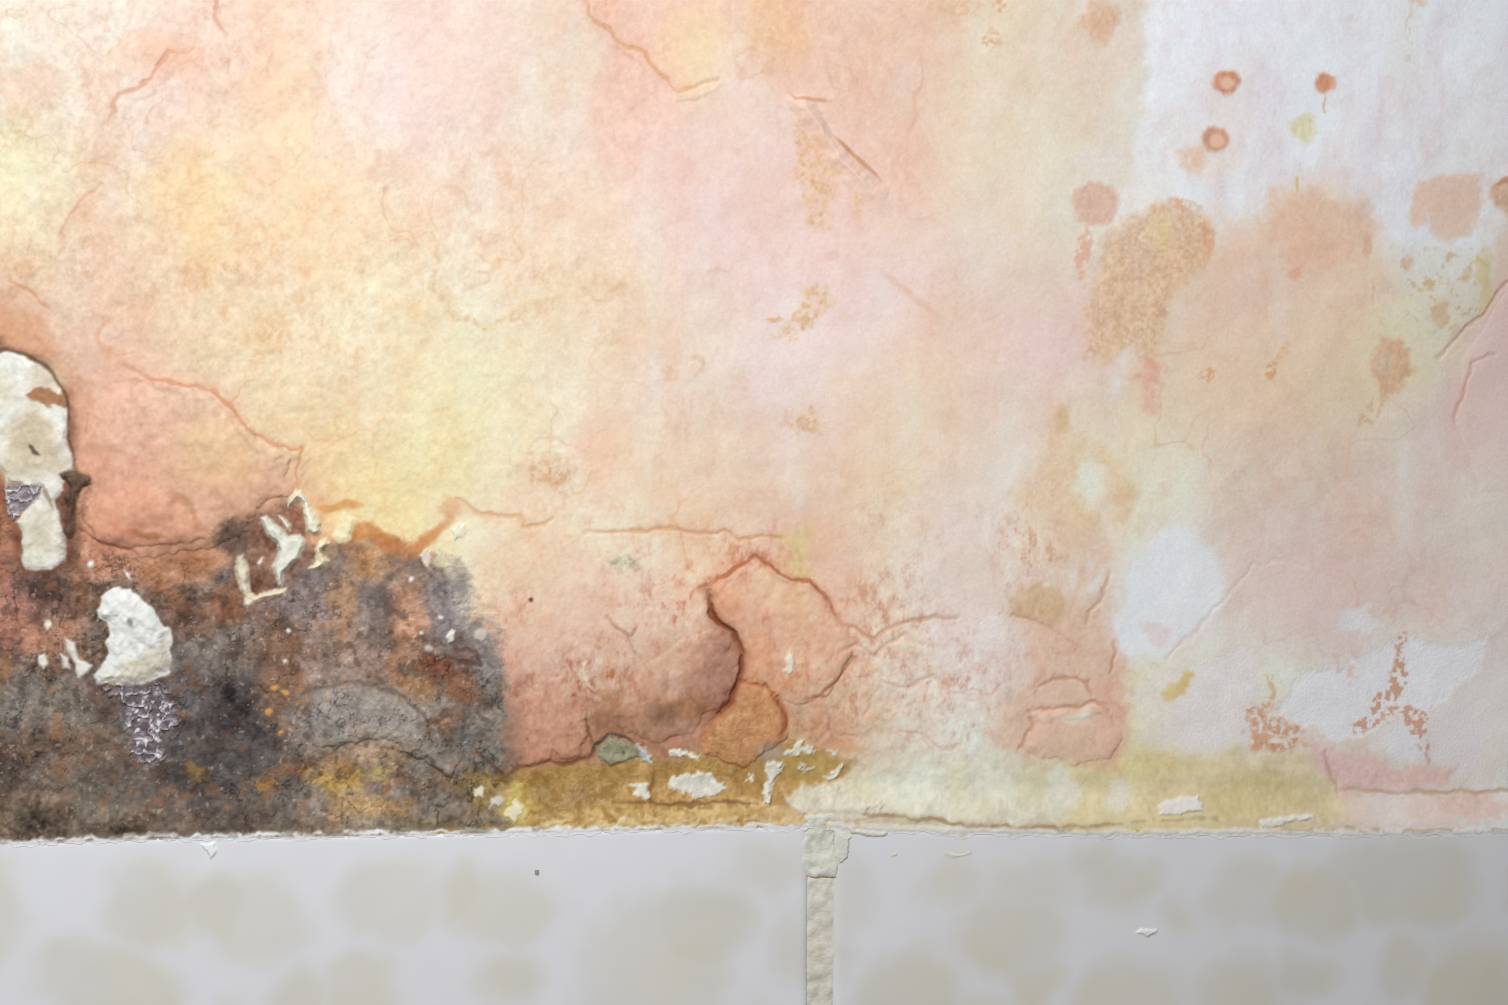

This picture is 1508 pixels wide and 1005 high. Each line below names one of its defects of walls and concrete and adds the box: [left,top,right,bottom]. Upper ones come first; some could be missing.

spalling [0,332,177,682]
crack [112,357,312,494]
leakage [0,519,514,840]
peeling [206,487,358,612]
crack [297,678,595,784]
crack [611,771,761,811]
crack [450,494,964,743]
leakage [0,0,1456,761]
crack [1015,566,1121,758]
corrosion [1068,50,1270,419]
leakage [839,566,1508,831]
corrosion [1259,68,1508,429]